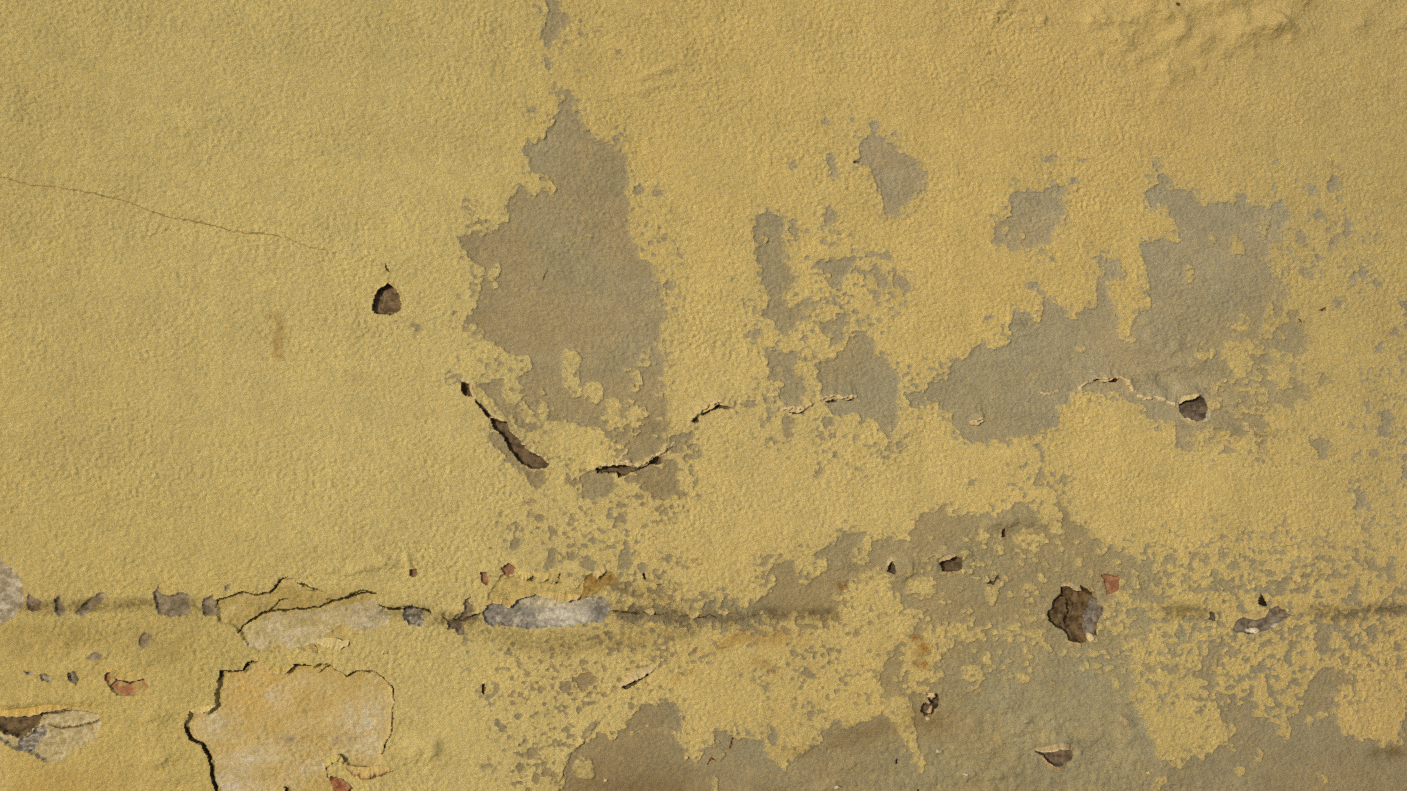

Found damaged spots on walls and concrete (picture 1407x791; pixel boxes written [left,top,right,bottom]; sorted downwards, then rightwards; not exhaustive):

crack [460,380,550,469]
crack [691,403,733,423]
peeling [402,0,1407,791]
crack [596,455,662,478]
crack [612,573,717,619]
crack [1059,593,1069,624]
flaking render [138,632,153,650]
peeling [152,577,395,791]